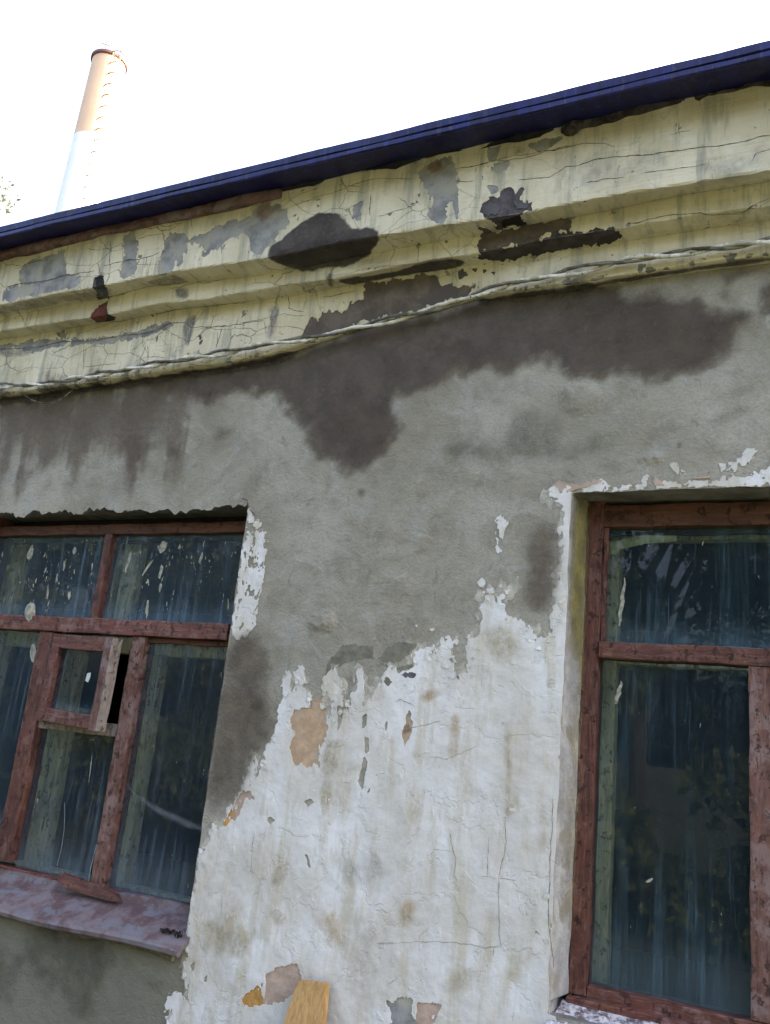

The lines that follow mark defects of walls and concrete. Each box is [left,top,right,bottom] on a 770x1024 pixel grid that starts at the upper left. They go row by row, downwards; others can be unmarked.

peeling [2,249,116,323]
crack [0,233,353,368]
crack [289,174,422,216]
leakage [0,259,770,472]
peeling [299,146,622,340]
crack [458,127,770,182]
crack [628,199,768,224]
leakage [207,639,266,803]
peeling [164,448,770,1024]
crack [376,816,517,954]
crack [548,800,557,968]